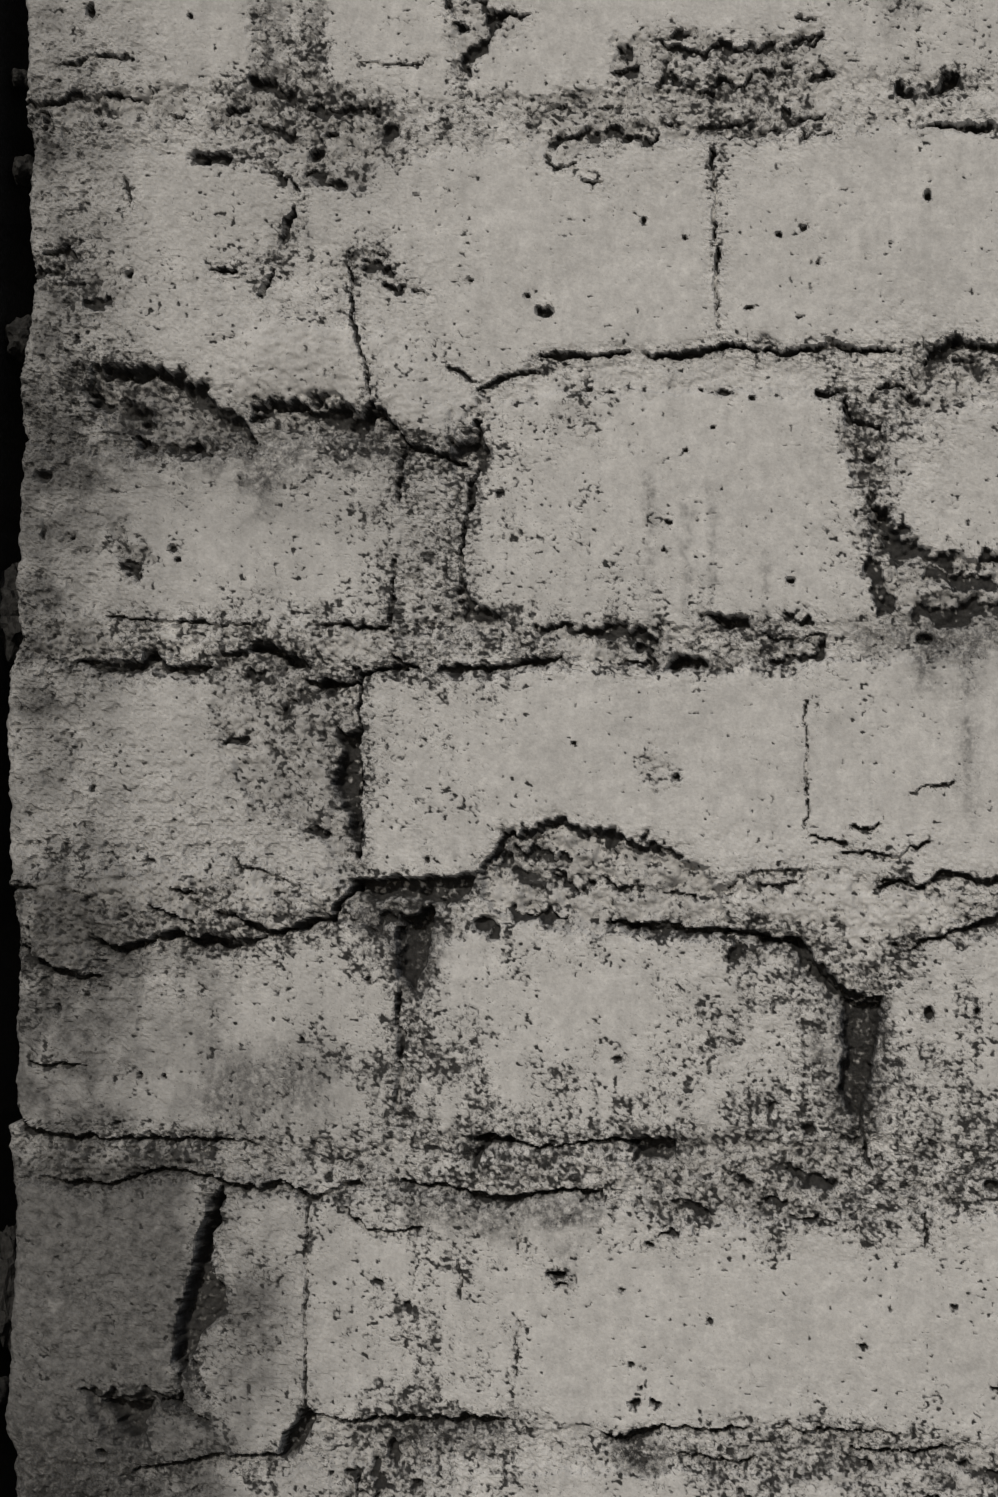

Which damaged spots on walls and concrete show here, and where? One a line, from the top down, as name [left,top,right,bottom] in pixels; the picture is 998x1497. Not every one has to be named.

spalling [514,12,839,191]
crack [209,204,297,297]
crack [348,251,475,587]
crack [445,147,897,439]
crack [22,558,563,988]
spalling [207,638,800,1002]
crack [727,699,998,952]
crack [606,917,884,1007]
spalling [0,1376,9,1405]
crack [132,1359,287,1474]
crack [17,1119,511,1429]
crack [400,1132,640,1256]